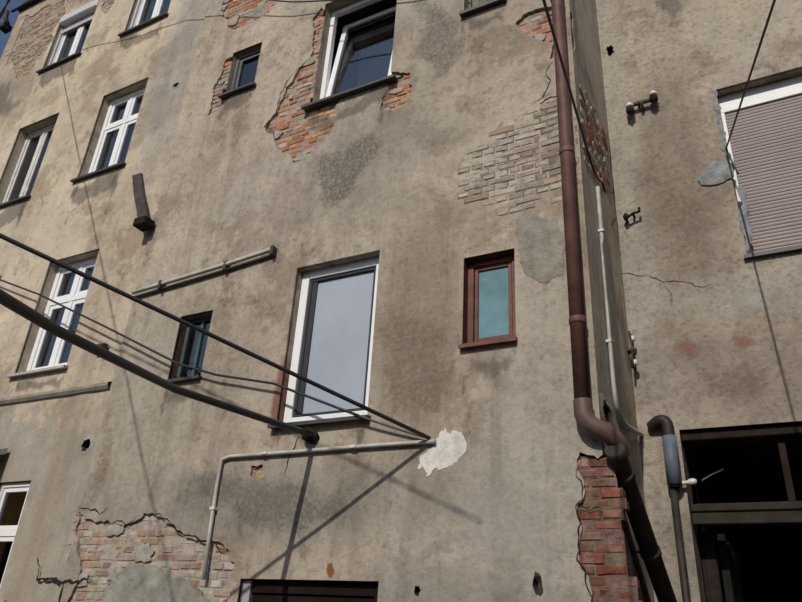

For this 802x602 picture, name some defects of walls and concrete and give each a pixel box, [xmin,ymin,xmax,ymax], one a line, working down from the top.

flaking render [221,0,277,31]
flaking render [210,58,233,115]
flaking render [265,10,339,163]
flaking render [381,73,412,112]
flaking render [457,6,562,216]
flaking render [572,84,611,194]
crack [622,273,717,300]
spalling [599,392,612,425]
flaking render [65,504,236,602]
flaking render [575,454,642,602]